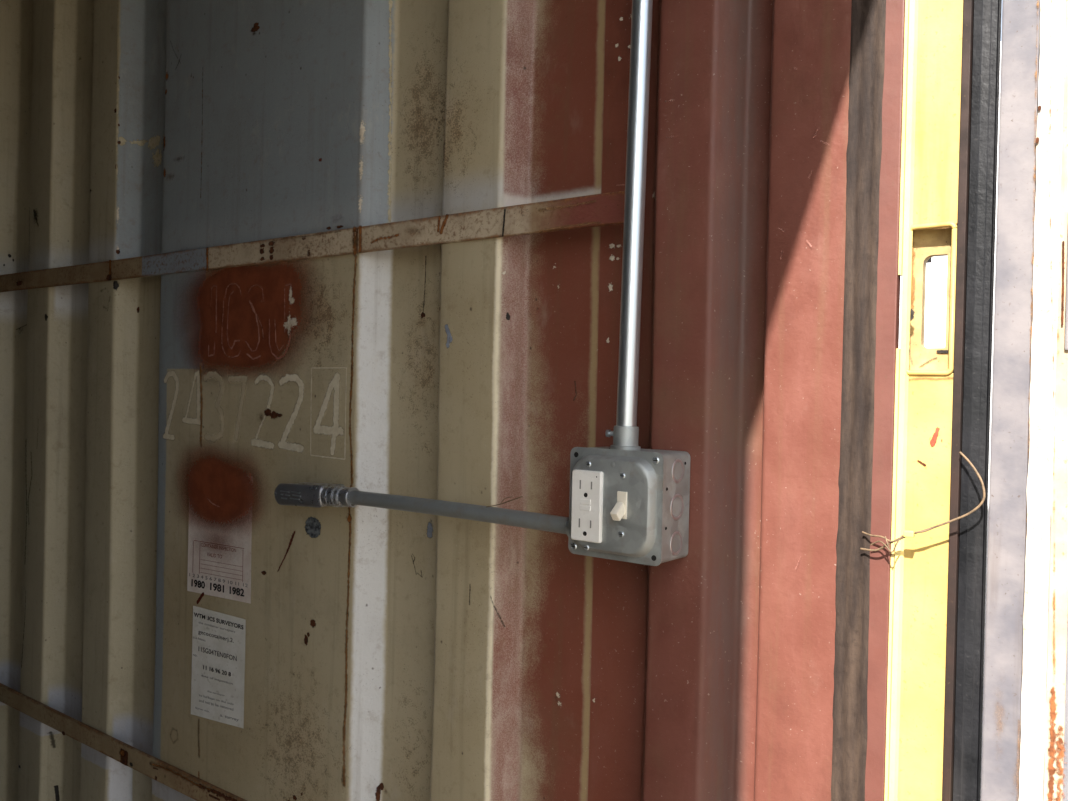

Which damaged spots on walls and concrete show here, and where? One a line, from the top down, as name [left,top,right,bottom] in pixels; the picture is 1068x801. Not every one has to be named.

rust [119,748,133,767]
rust [1047,687,1065,801]
rust [150,763,237,801]